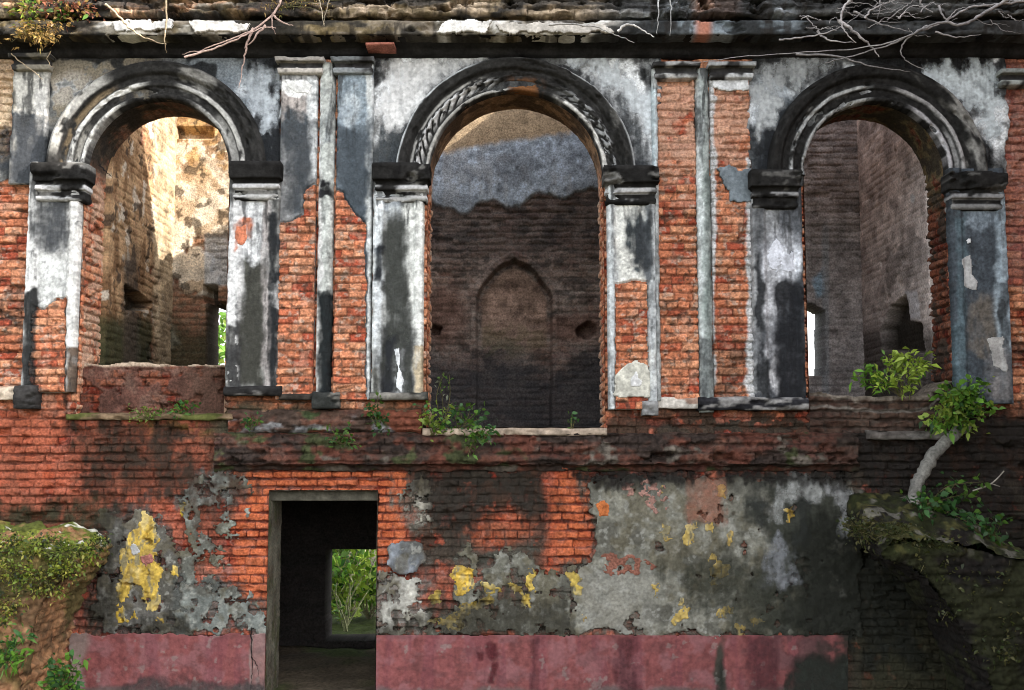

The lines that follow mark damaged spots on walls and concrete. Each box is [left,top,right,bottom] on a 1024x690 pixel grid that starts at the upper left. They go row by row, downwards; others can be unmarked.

leakage [0,119,44,184]
peeling [712,80,749,92]
peeling [717,165,751,203]
leakage [239,214,277,386]
flaking render [333,191,367,400]
leakage [374,214,412,393]
flaking render [613,281,651,409]
leakage [775,285,805,398]
peeling [95,468,266,636]
peeling [376,471,863,639]
leakage [685,499,926,690]